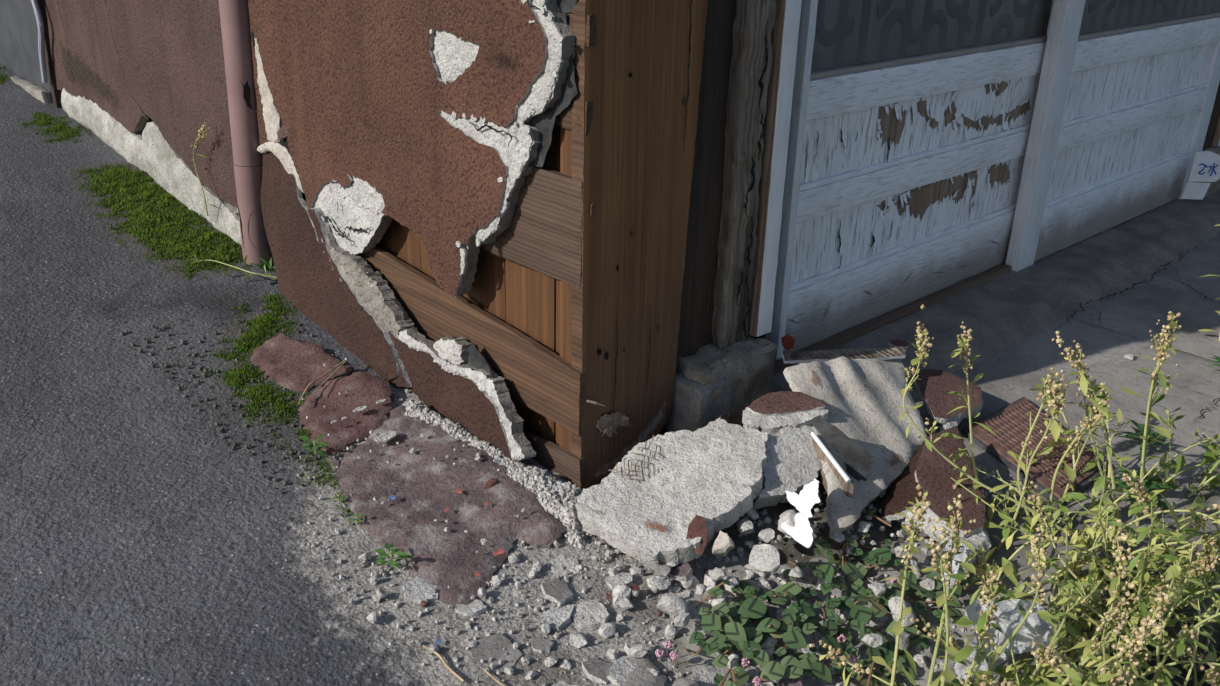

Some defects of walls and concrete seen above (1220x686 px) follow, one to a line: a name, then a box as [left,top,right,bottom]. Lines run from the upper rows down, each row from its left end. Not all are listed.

flaking render [429,29,475,85]
flaking render [441,0,564,275]
peeling [876,81,1030,149]
peeling [877,157,1014,220]
flaking render [308,176,536,461]
crack [1055,245,1220,329]
crack [1192,391,1220,424]